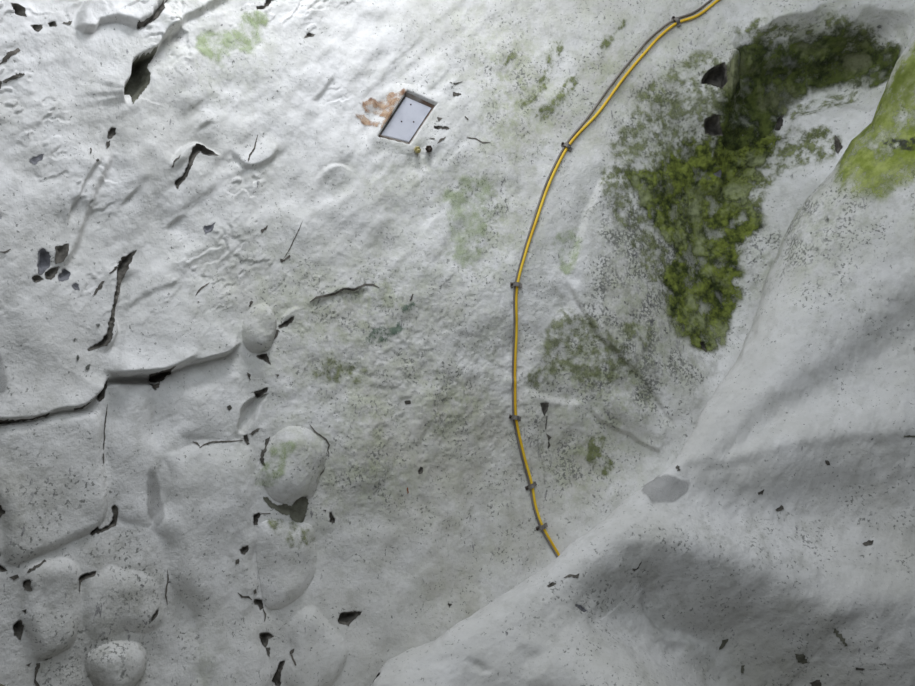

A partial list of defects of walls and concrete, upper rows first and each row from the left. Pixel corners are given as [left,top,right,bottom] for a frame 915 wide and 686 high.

rust [356,89,406,127]
leakage [884,138,915,151]